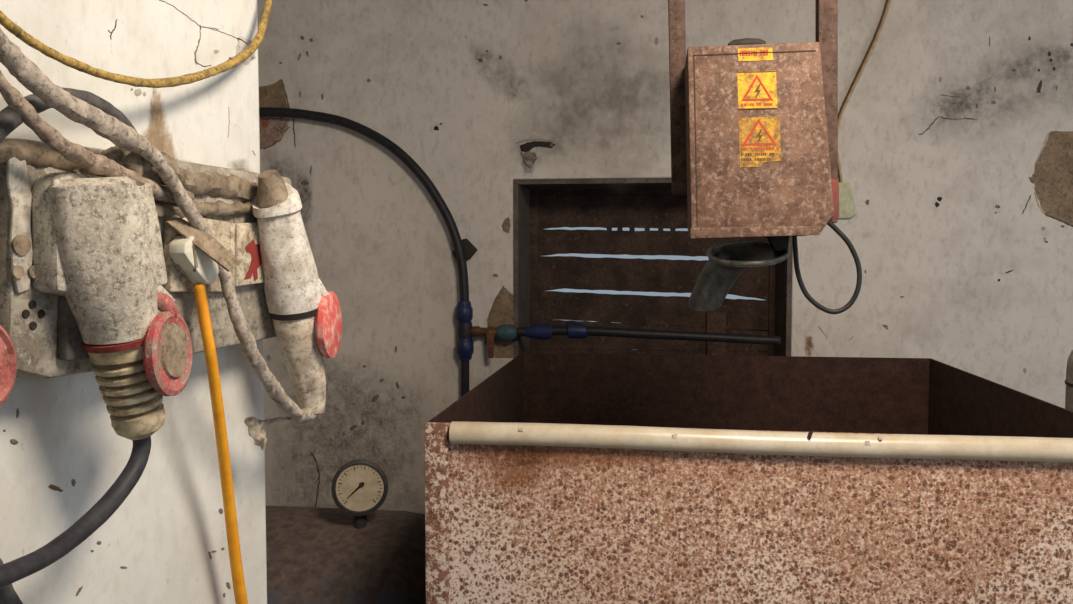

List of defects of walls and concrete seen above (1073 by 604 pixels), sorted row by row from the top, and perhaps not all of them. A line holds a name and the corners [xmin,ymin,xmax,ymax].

crack [159,0,240,67]
flaking render [259,79,301,149]
flaking render [1029,131,1073,243]
flaking render [485,274,514,358]